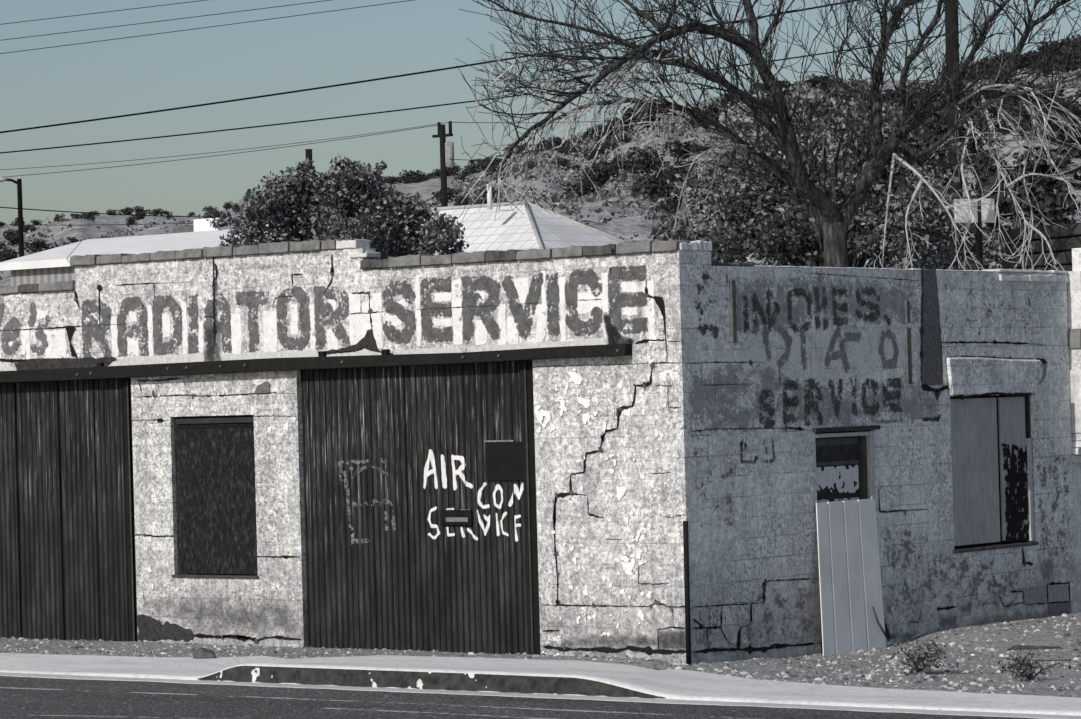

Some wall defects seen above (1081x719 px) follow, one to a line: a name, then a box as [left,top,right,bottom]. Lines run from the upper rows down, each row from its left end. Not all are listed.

crack [416,302,542,310]
crack [536,282,821,655]
peeling [816,465,859,502]
peeling [1037,448,1070,567]
peeling [747,580,818,643]
peeling [883,529,1070,631]